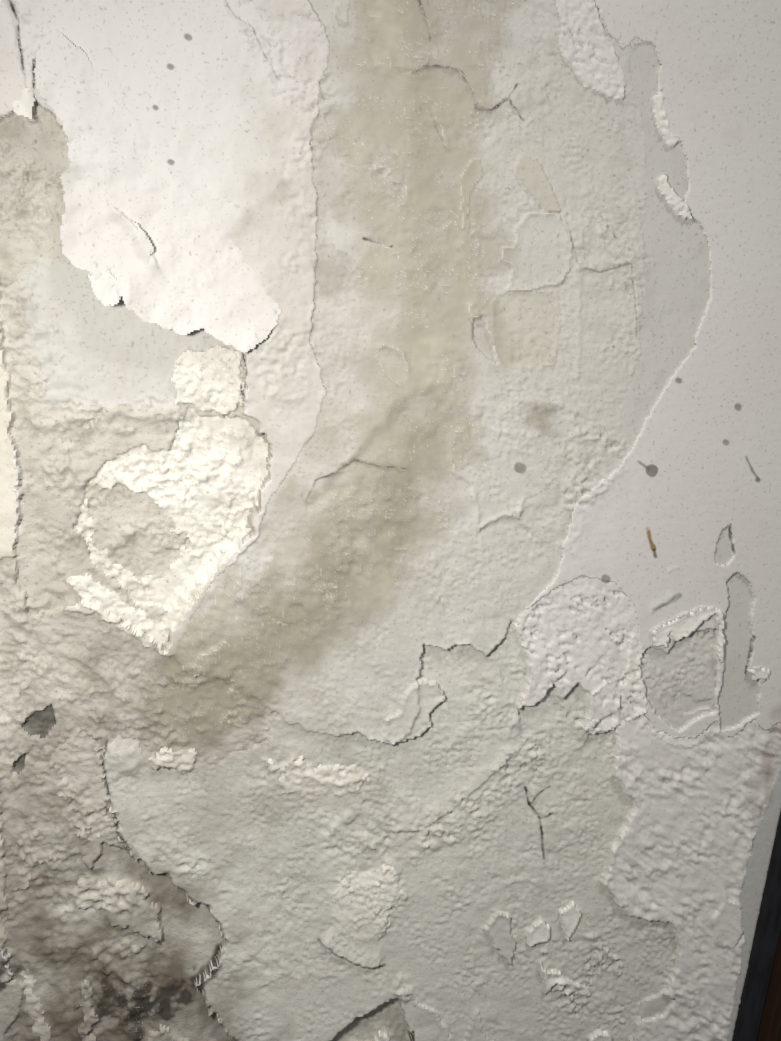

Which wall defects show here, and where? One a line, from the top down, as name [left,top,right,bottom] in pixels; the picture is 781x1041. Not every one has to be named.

spalling [0,0,281,903]
damp [262,479,413,649]
damp [340,0,496,405]
damp [364,412,472,486]
peeling [175,0,770,748]
damp [95,945,223,1041]
peeling [0,621,679,1041]
crack [525,786,552,858]